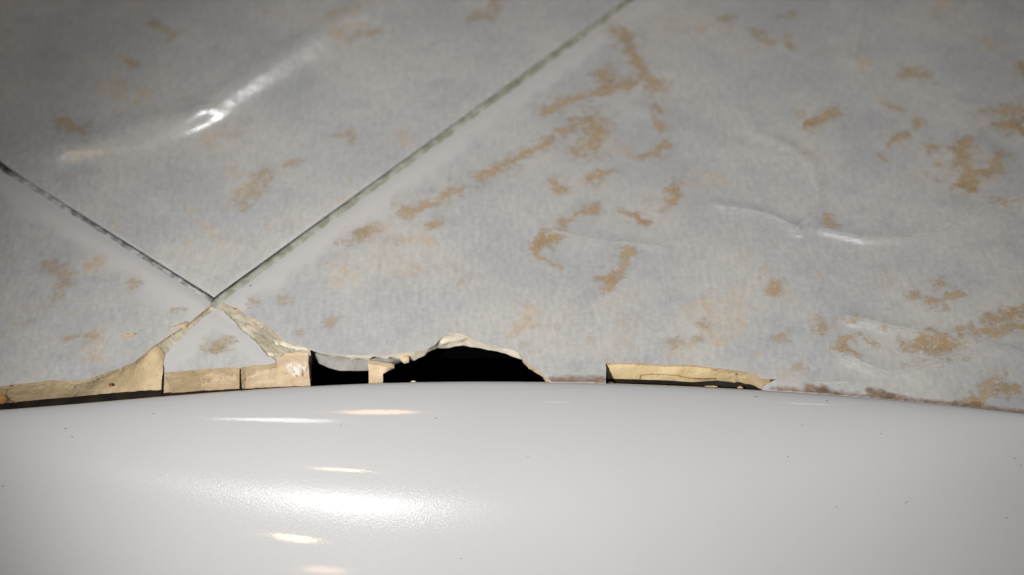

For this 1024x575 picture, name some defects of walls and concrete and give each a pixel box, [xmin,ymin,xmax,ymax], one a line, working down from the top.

spalling [0,346,171,403]
spalling [200,334,521,390]
peeling [606,364,762,390]
corrosion [773,380,1021,413]